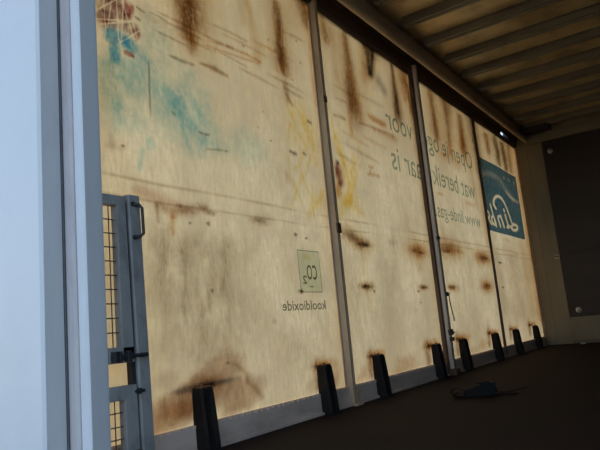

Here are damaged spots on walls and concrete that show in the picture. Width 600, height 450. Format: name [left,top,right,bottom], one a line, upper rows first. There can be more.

corrosion [180,0,197,48]
corrosion [273,0,287,76]
corrosion [343,35,358,119]